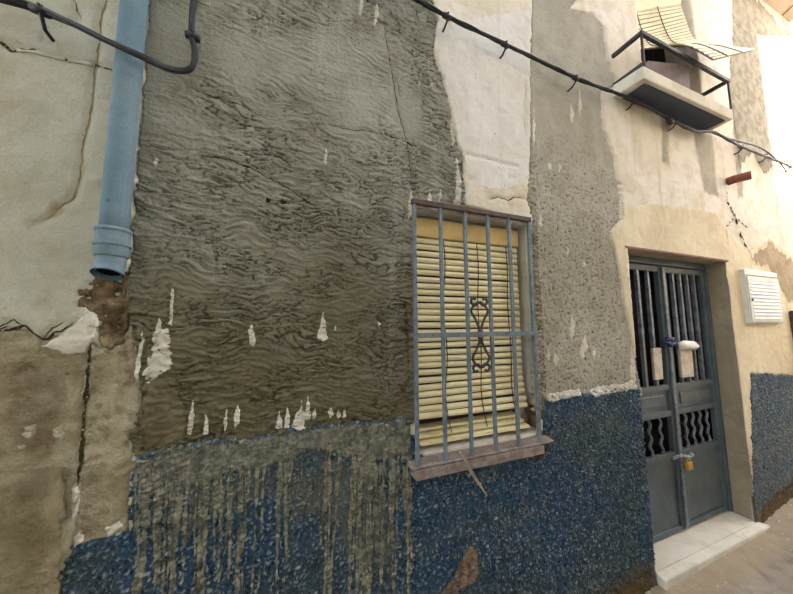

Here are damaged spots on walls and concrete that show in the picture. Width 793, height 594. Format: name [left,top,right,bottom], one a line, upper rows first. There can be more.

crack [0,0,113,222]
crack [0,319,74,340]
peeling [0,0,472,547]
peeling [467,0,793,522]
crack [77,344,91,486]
leakage [131,438,268,594]
leakage [275,435,294,594]
leakage [319,424,413,594]